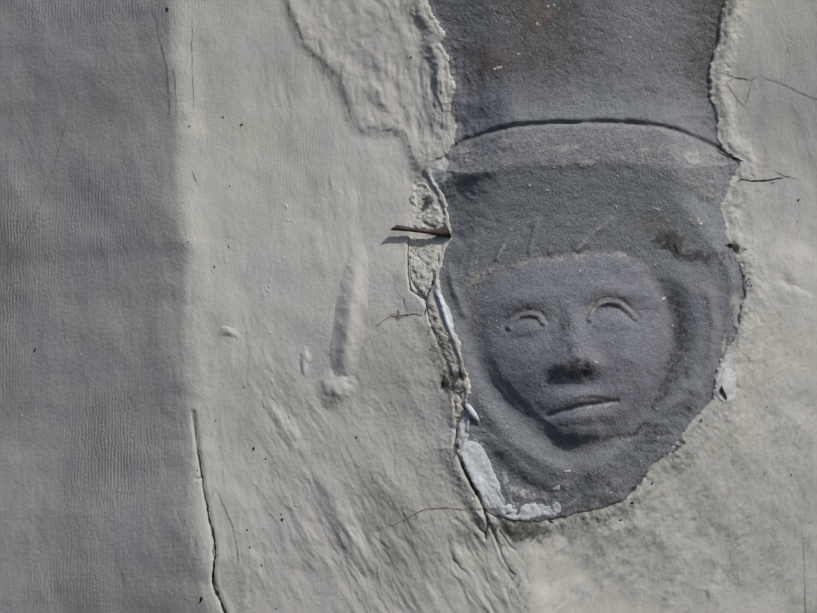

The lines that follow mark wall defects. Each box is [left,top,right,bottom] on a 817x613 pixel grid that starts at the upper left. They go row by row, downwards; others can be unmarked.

peeling [419,0,453,146]
crack [717,71,817,104]
crack [716,149,796,183]
peeling [409,157,561,521]
peeling [715,291,748,404]
crack [193,416,239,613]